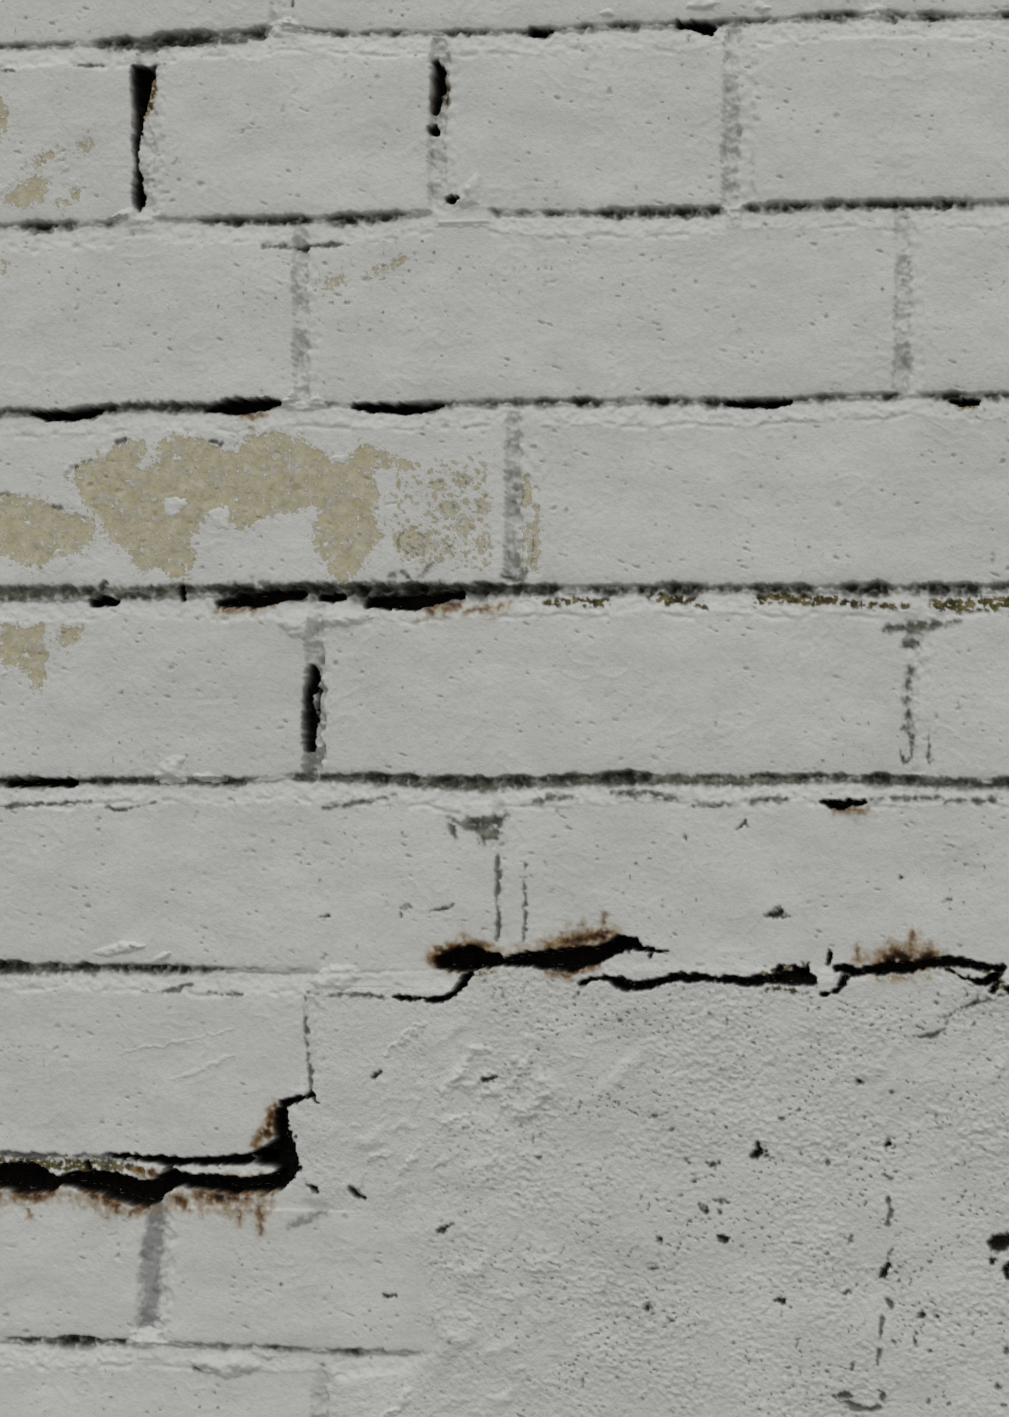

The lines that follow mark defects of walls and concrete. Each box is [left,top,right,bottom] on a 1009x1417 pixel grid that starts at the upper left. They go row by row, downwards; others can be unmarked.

peeling [0,429,493,584]
peeling [521,473,541,571]
peeling [0,621,84,689]
corrosion [428,934,493,975]
corrosion [547,913,617,949]
crack [578,952,1009,1007]
corrosion [856,931,938,980]
corrosion [251,1103,287,1149]
corrosion [0,1156,160,1177]
corrosion [13,1190,56,1217]
corrosion [82,1190,152,1216]
corrosion [171,1177,275,1234]